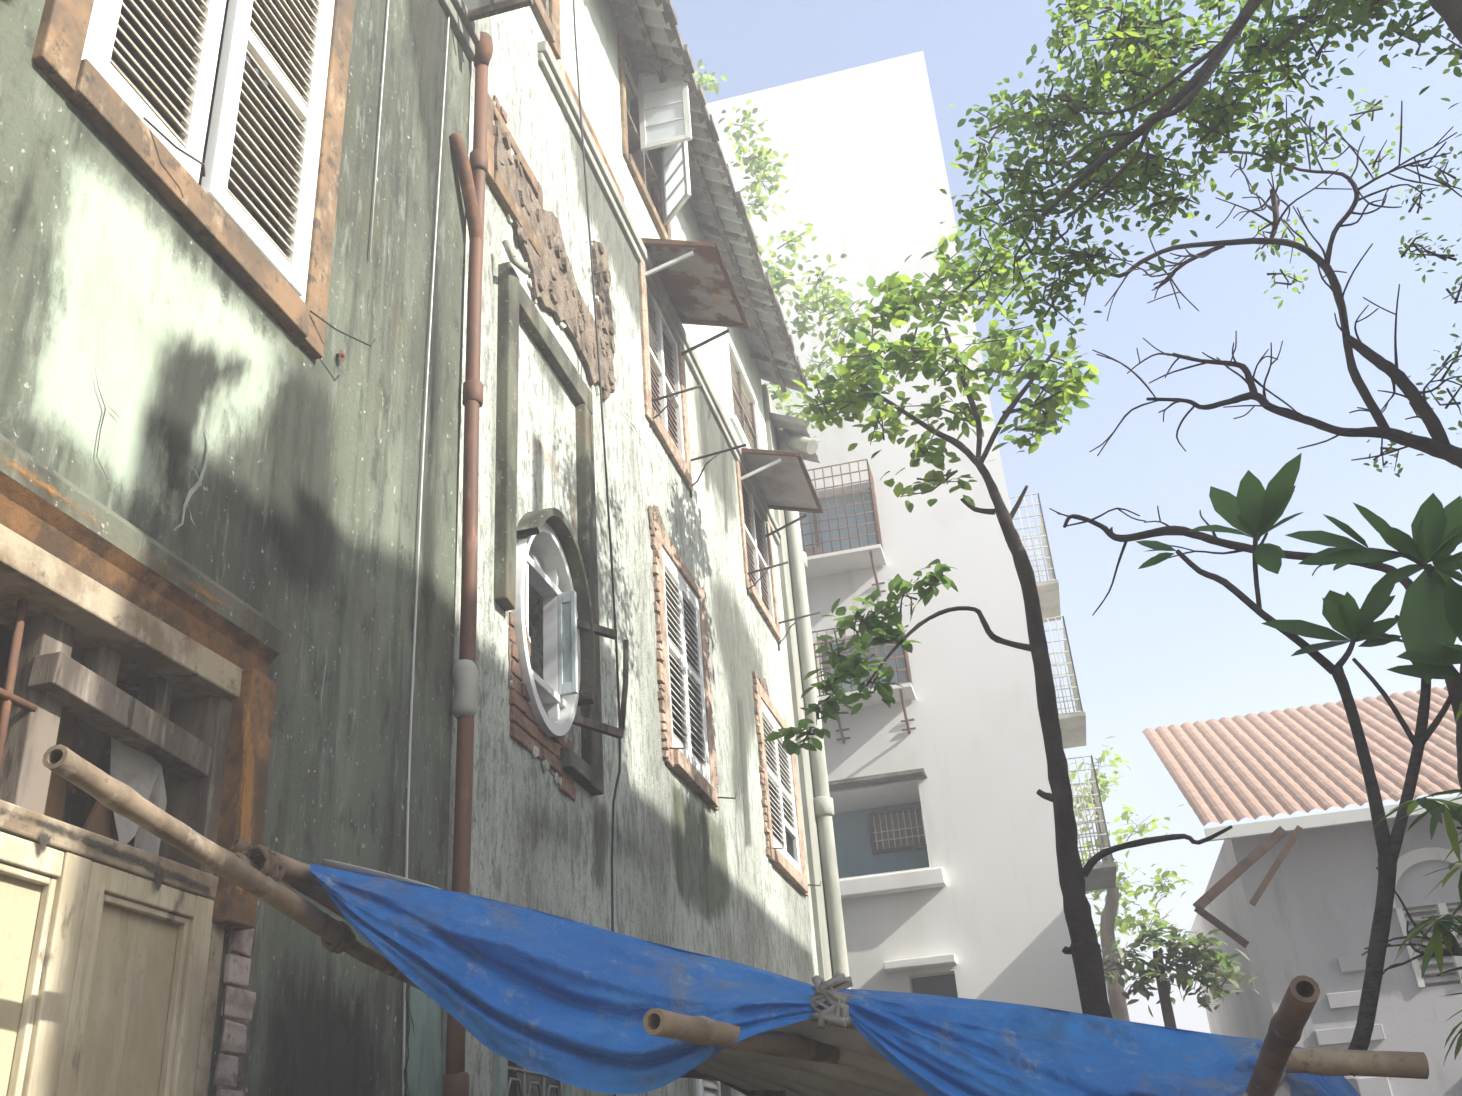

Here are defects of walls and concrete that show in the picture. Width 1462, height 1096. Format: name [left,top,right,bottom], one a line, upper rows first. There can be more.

water stain [153,339,246,501]
water stain [274,376,334,588]